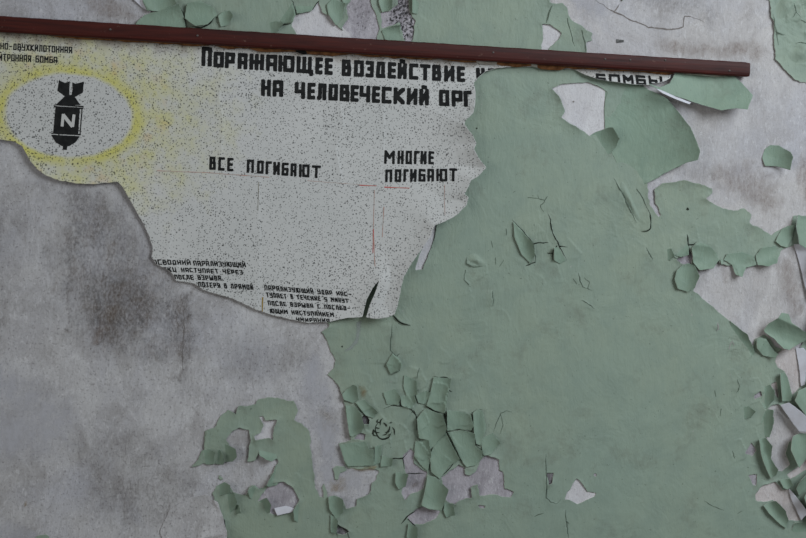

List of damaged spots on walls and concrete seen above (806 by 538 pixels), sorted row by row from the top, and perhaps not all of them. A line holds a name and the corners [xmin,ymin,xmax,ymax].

peeling [0,0,233,27]
peeling [269,0,419,41]
peeling [541,24,561,50]
peeling [0,140,513,538]
crack [372,315,459,474]
peeling [550,0,806,532]